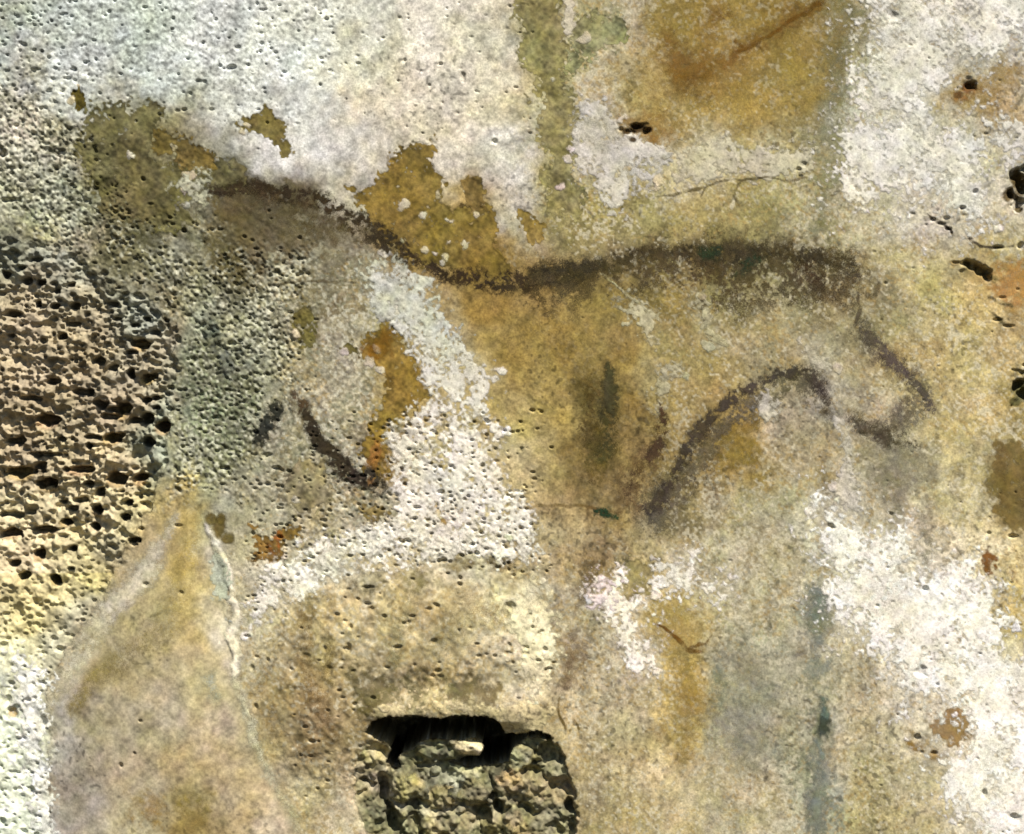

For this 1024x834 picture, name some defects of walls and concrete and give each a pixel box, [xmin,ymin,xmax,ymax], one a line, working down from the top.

crack [665,176,805,201]
rust [930,707,970,747]
spalling [353,732,577,834]